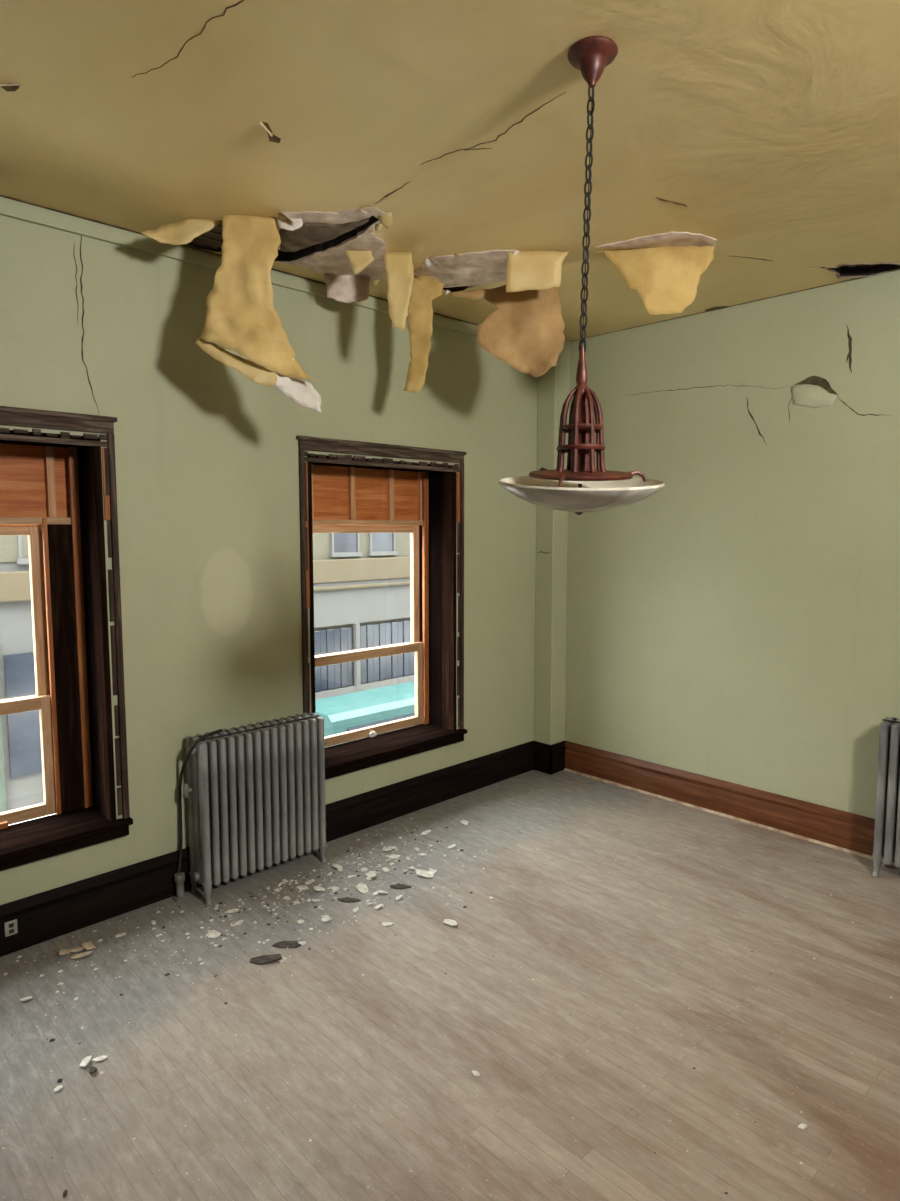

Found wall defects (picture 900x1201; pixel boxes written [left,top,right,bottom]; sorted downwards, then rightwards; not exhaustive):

crack [132,0,244,78]
crack [375,93,565,204]
crack [73,236,99,413]
flaking render [141,207,569,413]
flaking render [595,232,716,316]
spalling [810,262,900,279]
crack [635,385,792,444]
crack [838,325,890,416]